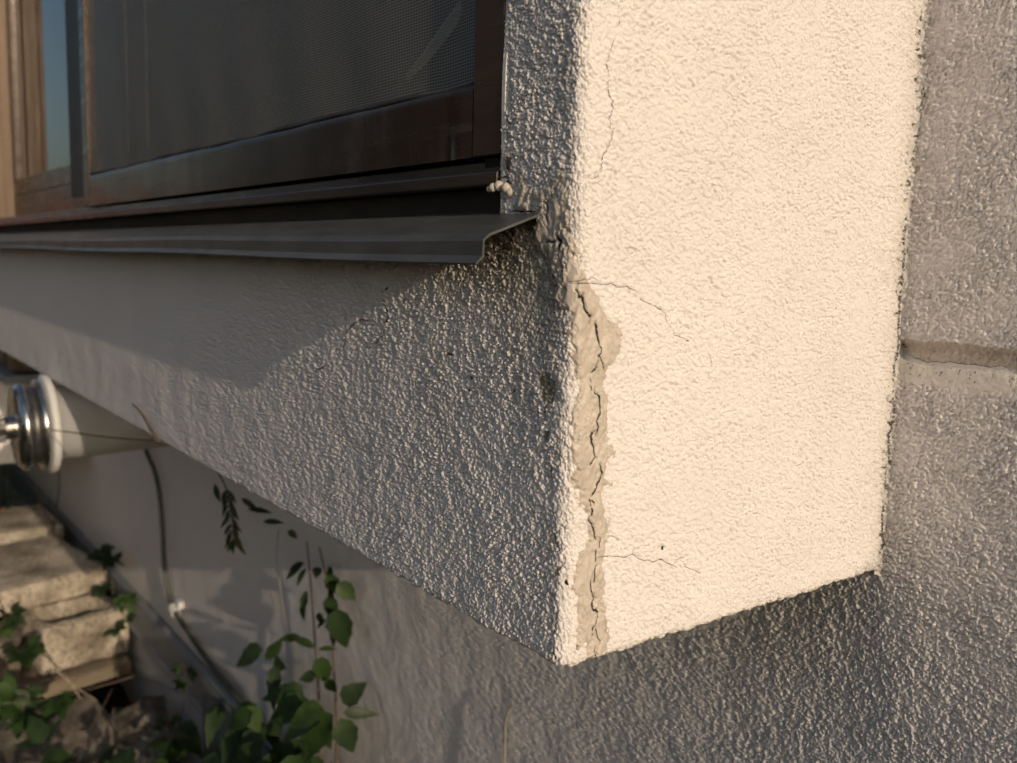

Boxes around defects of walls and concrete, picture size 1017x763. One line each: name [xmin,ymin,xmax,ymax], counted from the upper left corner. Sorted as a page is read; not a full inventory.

crack [541,201,700,661]
crack [864,3,1013,576]